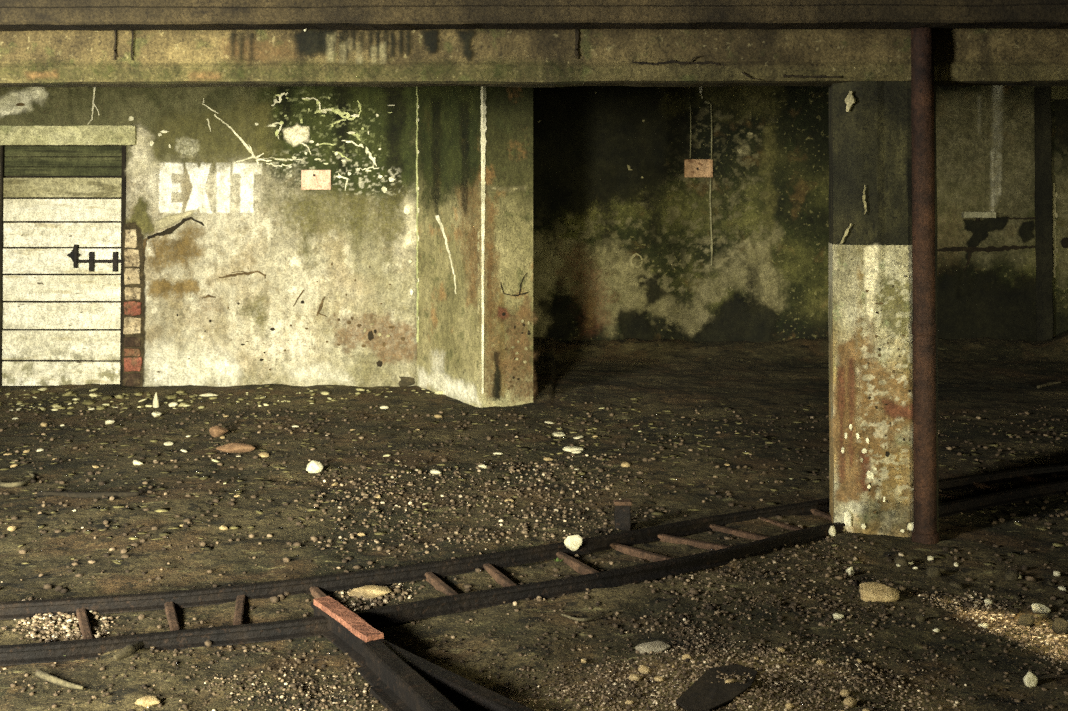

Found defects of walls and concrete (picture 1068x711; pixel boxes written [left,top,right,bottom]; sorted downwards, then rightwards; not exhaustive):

water stain [295,30,437,63]
water stain [456,30,474,60]
water stain [155,86,485,256]
peeling [255,97,395,193]
water stain [533,86,776,248]
crack [143,217,204,270]
flaking render [326,87,419,367]
crack [202,270,266,299]
water stain [539,281,584,340]
water stain [618,275,664,340]
water stain [688,269,777,343]
rust [832,334,913,502]